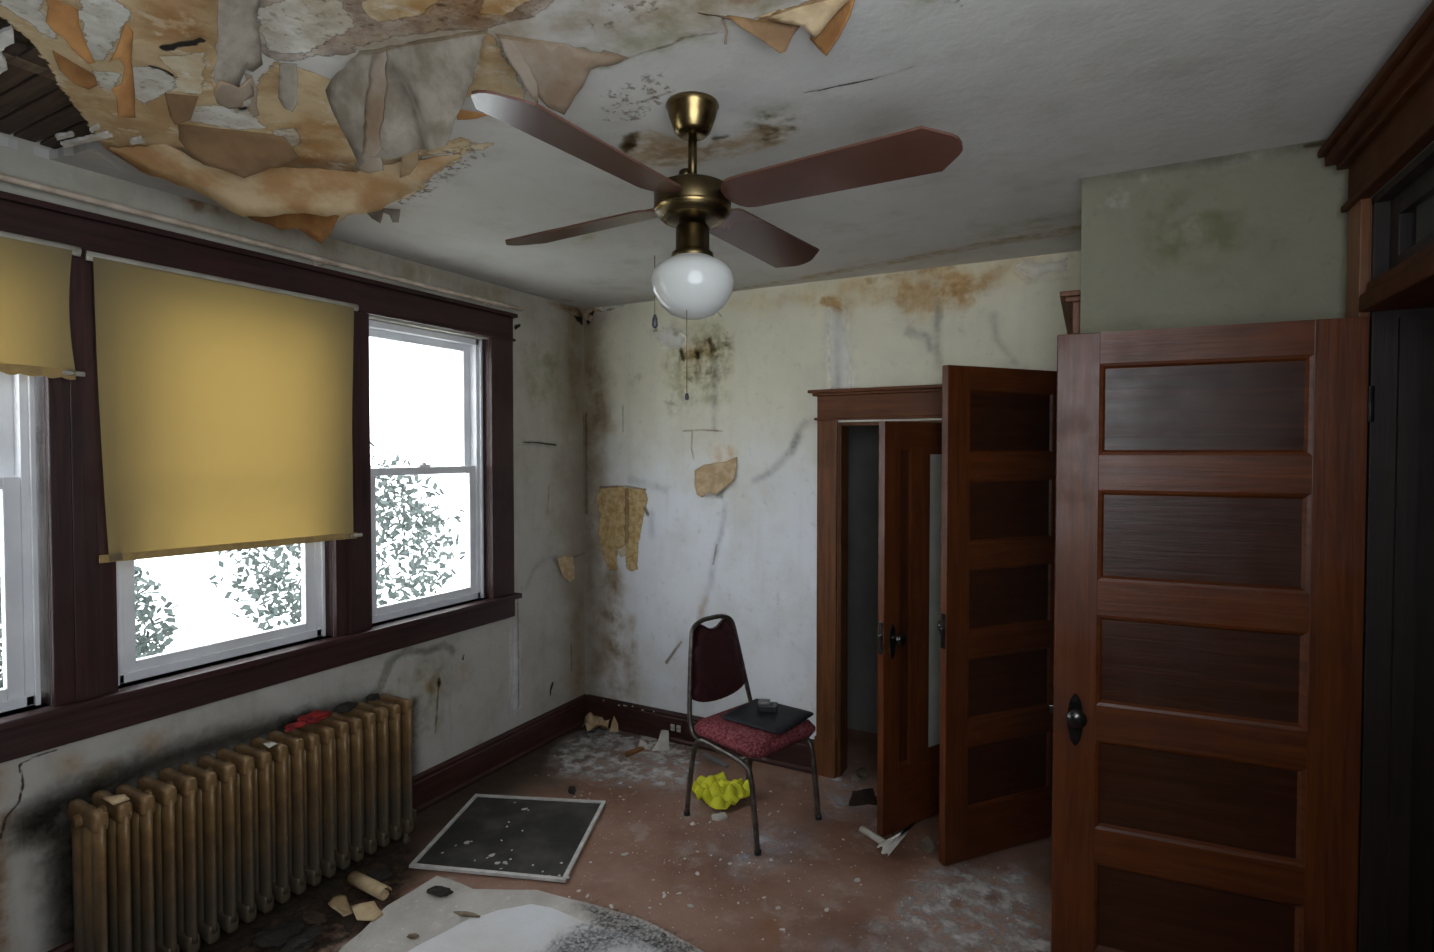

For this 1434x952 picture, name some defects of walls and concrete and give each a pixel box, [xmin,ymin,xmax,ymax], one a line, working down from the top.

flaking render [0,0,553,172]
peeling [608,76,669,120]
flaking render [382,137,494,204]
damp [622,134,635,152]
damp [665,334,715,360]
peeling [694,457,737,497]
flaking render [596,486,649,571]
crack [0,750,56,839]